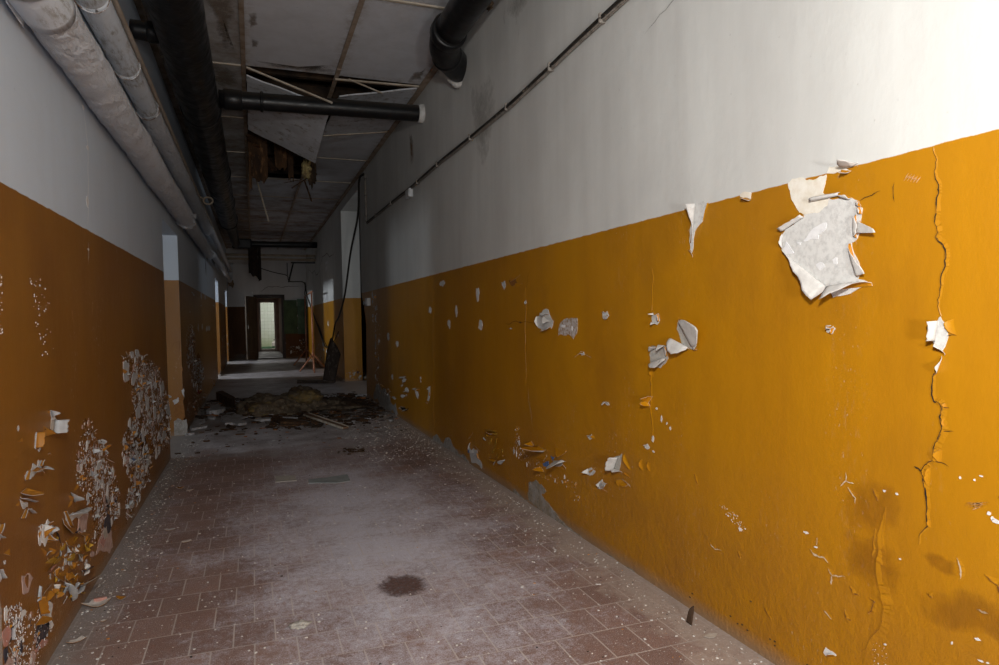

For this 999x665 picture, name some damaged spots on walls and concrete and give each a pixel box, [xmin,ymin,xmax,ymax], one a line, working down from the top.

peeling [685,201,709,258]
peeling [777,159,878,300]
peeling [534,309,578,339]
peeling [648,319,698,368]
crack [914,148,957,545]
peeling [0,350,188,665]
spalling [433,428,651,538]
leakage [379,575,423,596]